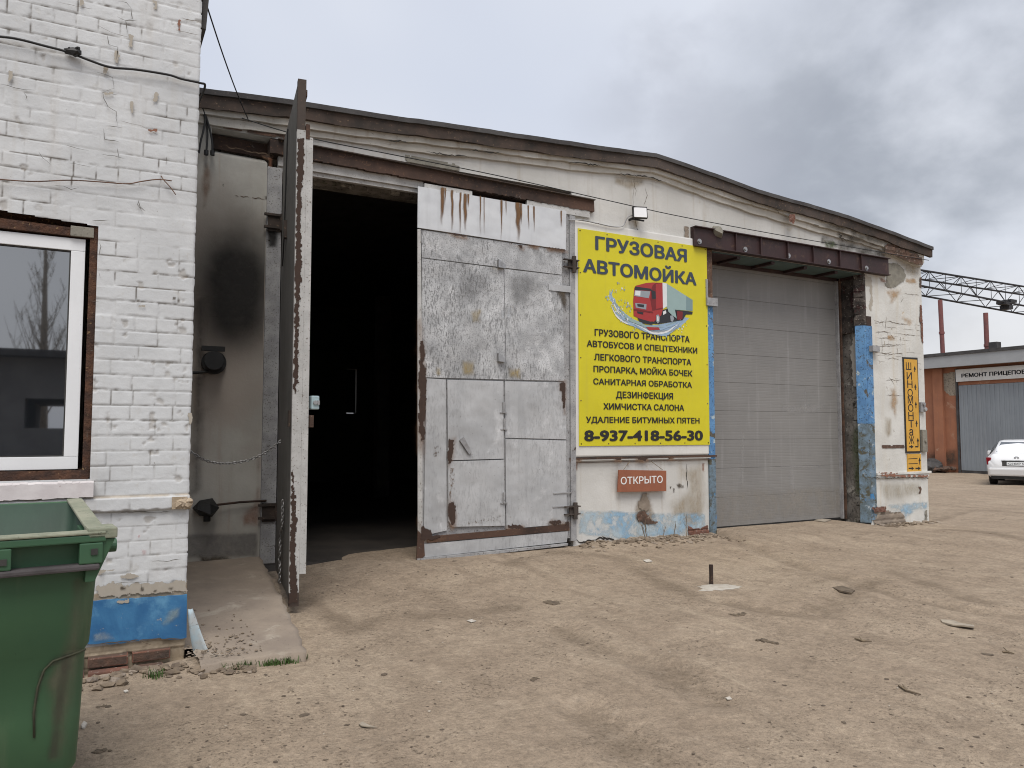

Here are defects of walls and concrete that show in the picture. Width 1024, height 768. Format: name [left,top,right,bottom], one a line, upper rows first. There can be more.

rust [441,187,485,238]
rust [501,200,535,232]
rust [293,138,305,393]
rust [418,341,523,529]
spalling [637,493,658,524]
rust [420,526,440,540]
spalling [688,525,709,535]
peeling [96,569,187,604]